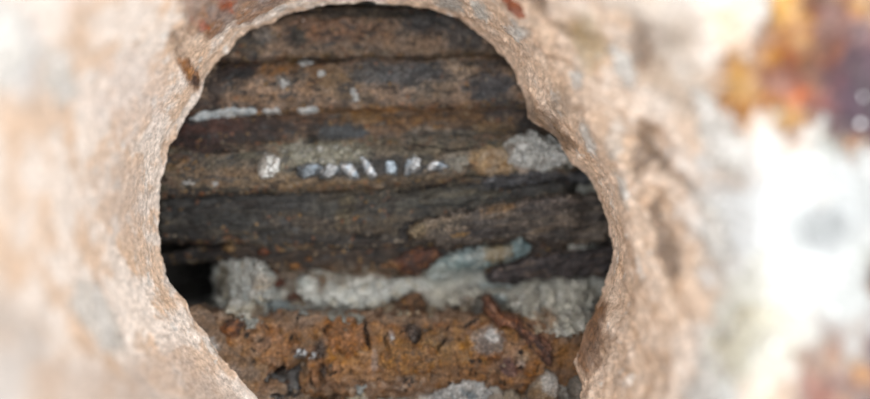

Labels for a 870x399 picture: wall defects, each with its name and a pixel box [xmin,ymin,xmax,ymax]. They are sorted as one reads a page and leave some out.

water stain [421,237,533,282]
rust [220,317,244,336]
spalling [264,363,303,399]
rust [325,318,366,358]
rust [301,337,443,399]
rust [464,317,553,378]